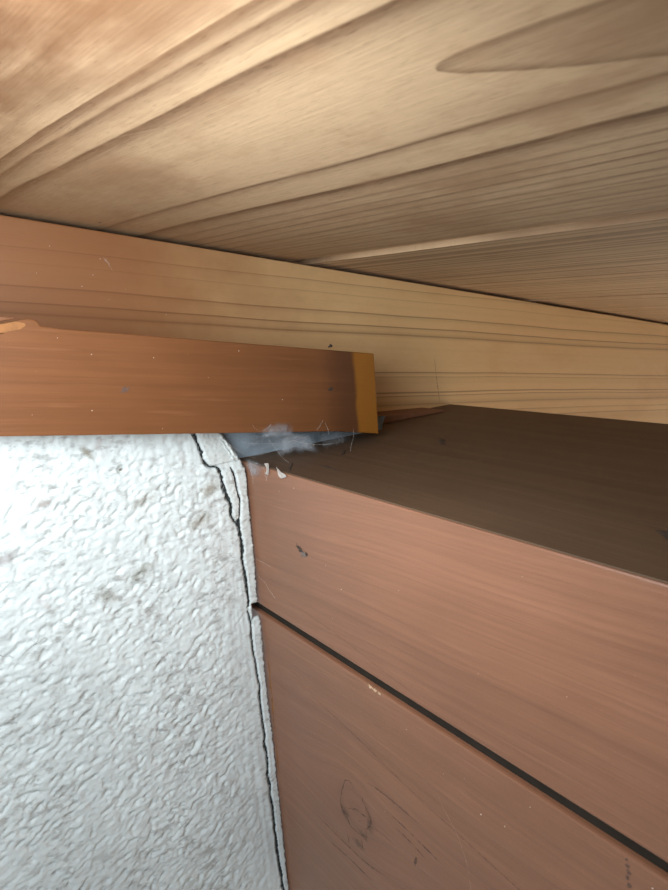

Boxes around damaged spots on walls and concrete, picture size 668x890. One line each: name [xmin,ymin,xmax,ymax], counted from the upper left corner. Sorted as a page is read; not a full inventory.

crack [193,434,284,890]